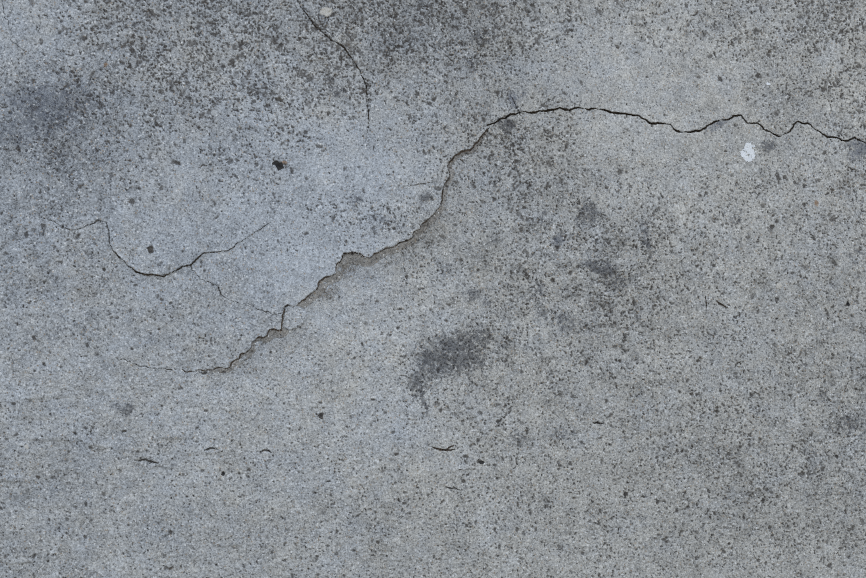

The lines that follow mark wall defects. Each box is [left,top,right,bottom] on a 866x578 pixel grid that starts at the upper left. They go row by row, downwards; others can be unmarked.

crack [297,0,369,127]
crack [487,98,866,144]
crack [41,217,281,315]